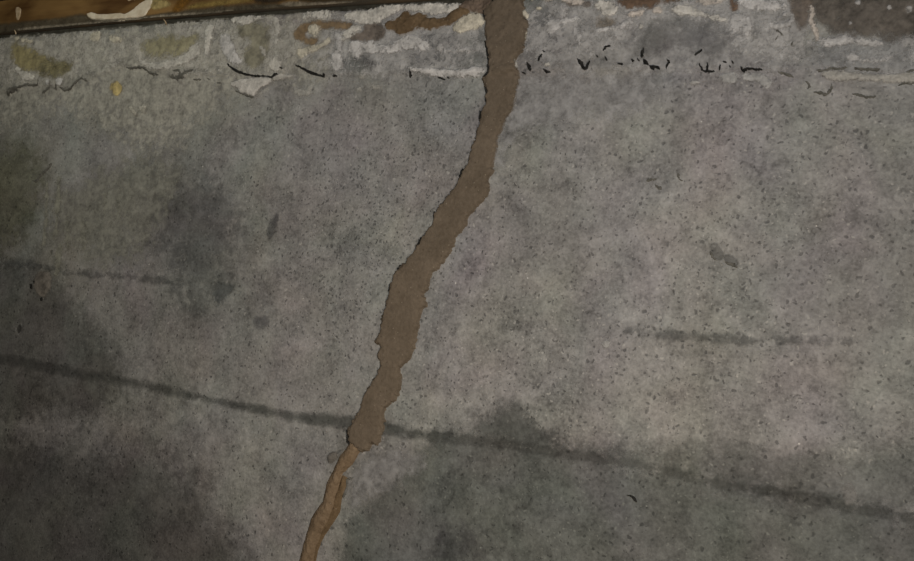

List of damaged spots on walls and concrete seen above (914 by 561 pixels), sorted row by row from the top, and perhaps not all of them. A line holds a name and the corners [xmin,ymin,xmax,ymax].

leakage [11,37,69,85]
leakage [135,15,281,71]
leakage [294,3,485,71]
leakage [408,66,485,78]
leakage [522,0,914,62]
leakage [0,264,118,416]
leakage [0,439,239,561]